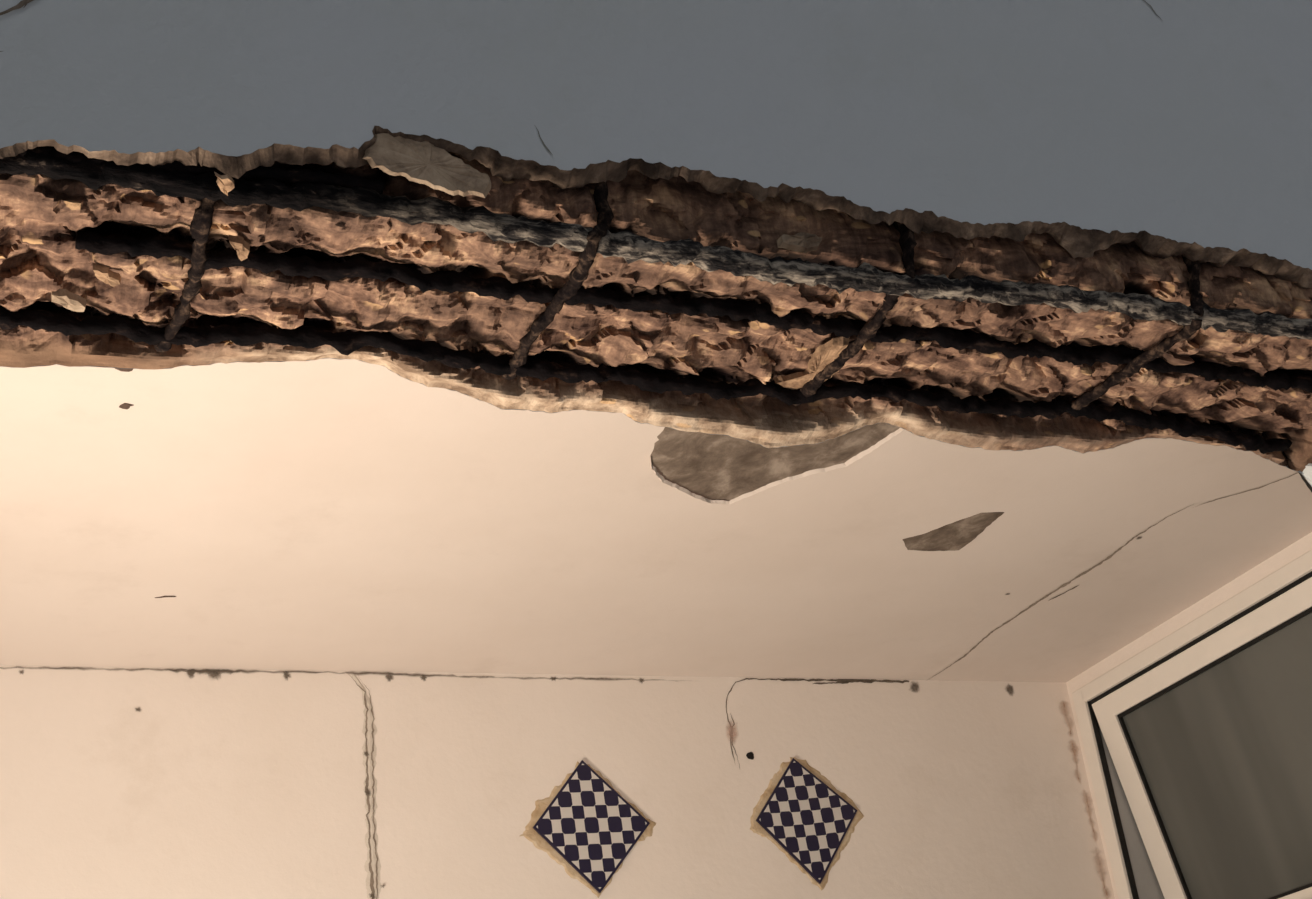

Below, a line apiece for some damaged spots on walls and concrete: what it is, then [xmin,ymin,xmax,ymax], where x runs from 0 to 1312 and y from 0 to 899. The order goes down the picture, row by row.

crack [0,0,33,15]
spalling [0,126,1312,505]
peeling [902,512,1004,551]
crack [520,675,636,683]
crack [3,667,489,899]